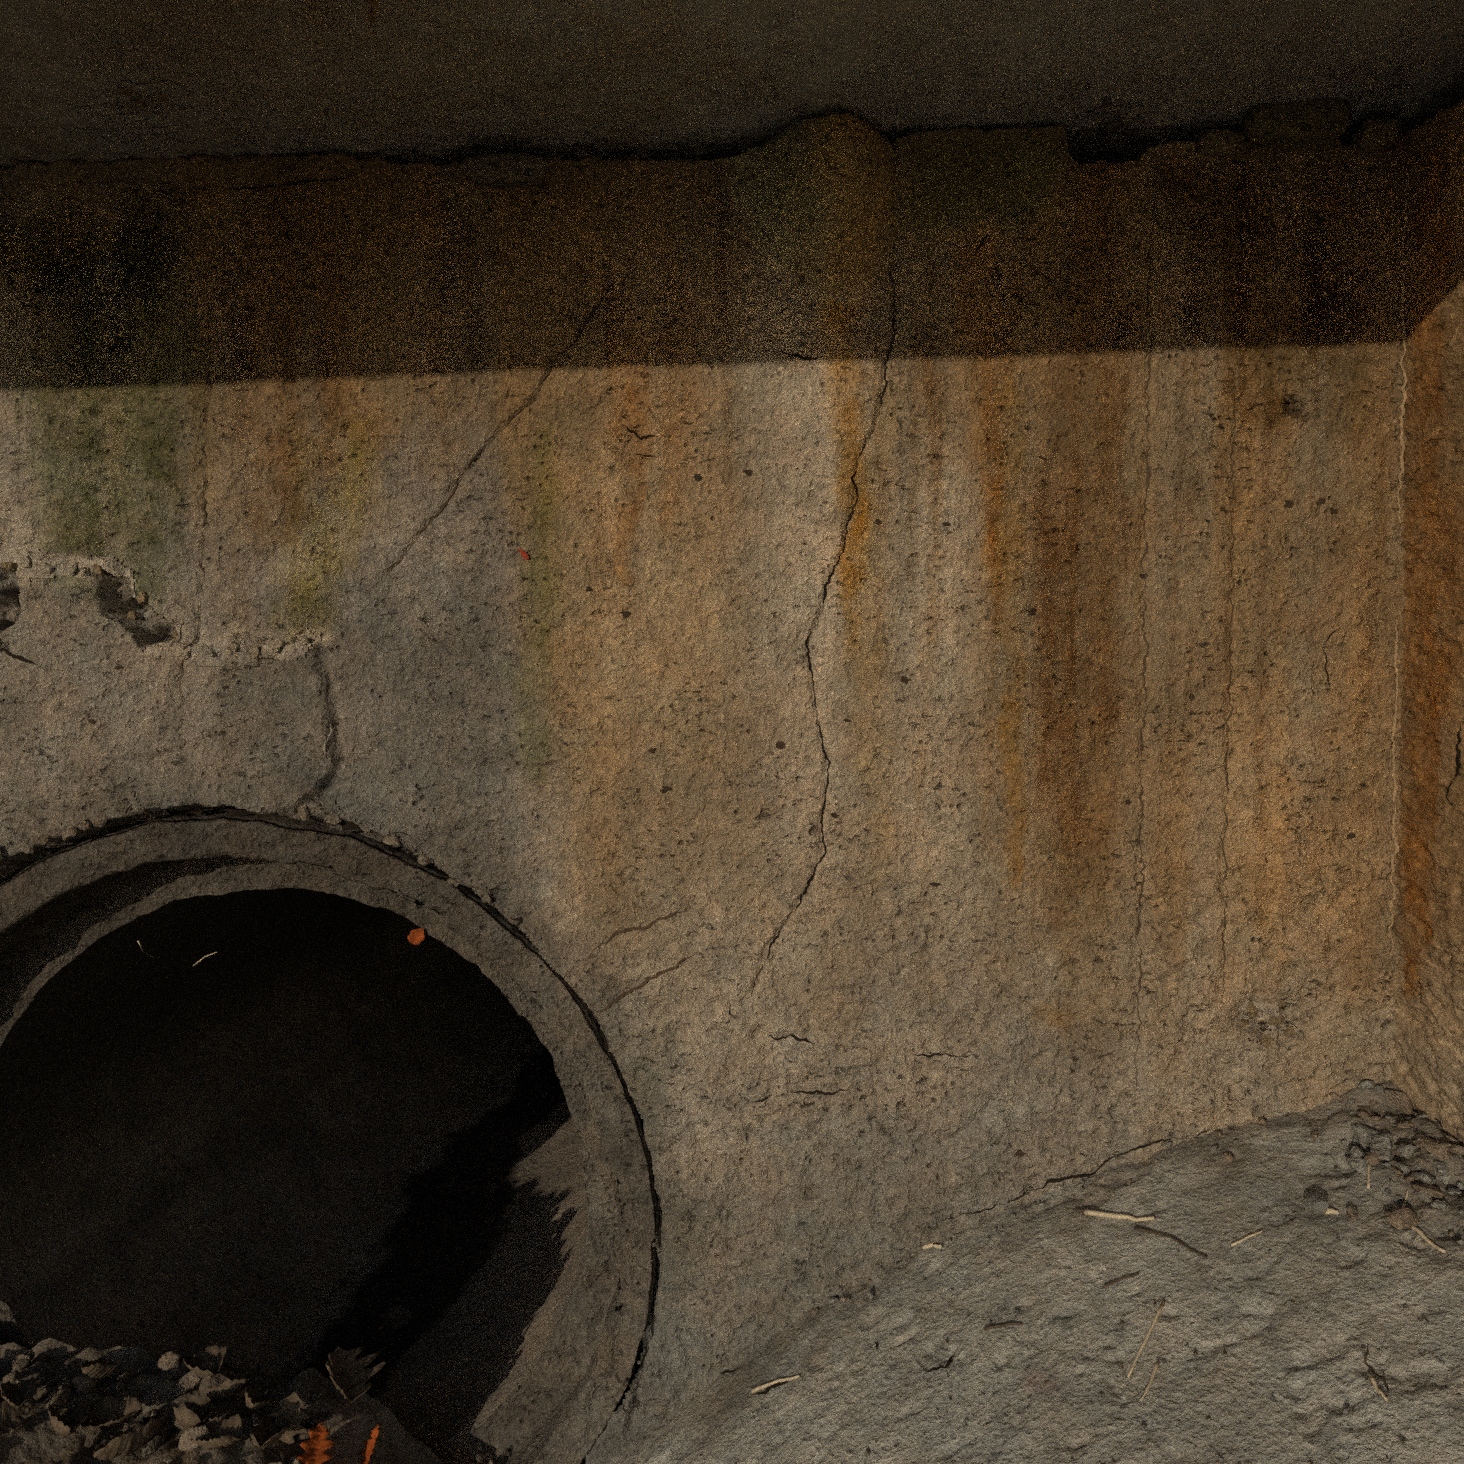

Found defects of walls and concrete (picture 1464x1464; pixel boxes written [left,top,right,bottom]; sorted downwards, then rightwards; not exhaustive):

crack [370,277,616,592]
water stain [1397,161,1410,523]
peeling [0,548,321,669]
crack [729,265,896,1019]
water stain [1388,620,1399,956]
crack [768,1034,813,1044]